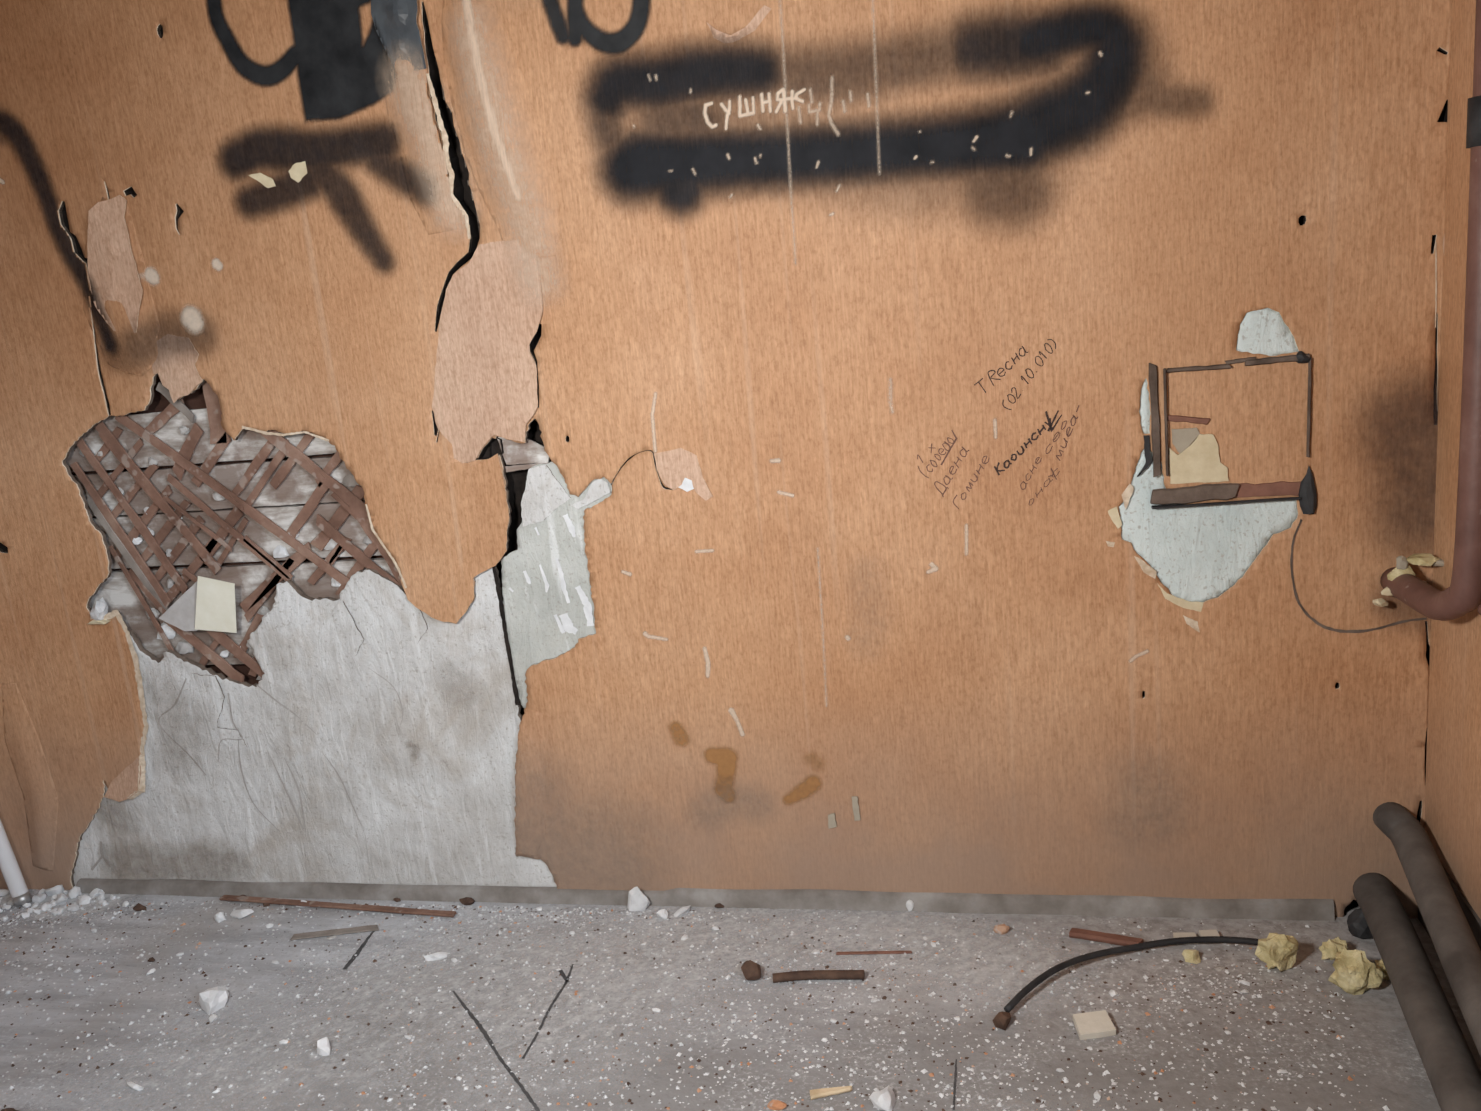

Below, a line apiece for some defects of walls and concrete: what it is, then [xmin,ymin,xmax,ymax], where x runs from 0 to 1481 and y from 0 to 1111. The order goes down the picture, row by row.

peeling [65,0,614,887]
crack [422,3,480,332]
crack [476,324,551,705]
peeling [1106,379,1298,632]
peeling [1236,308,1299,356]